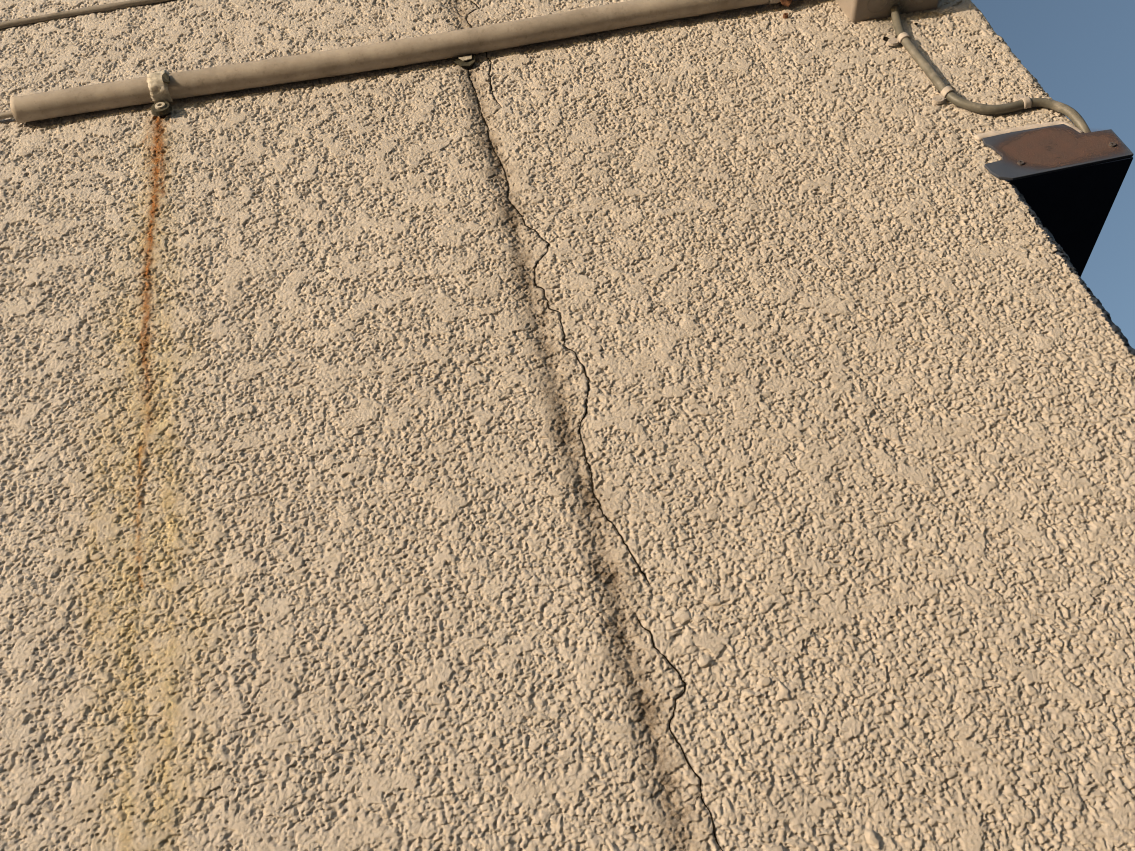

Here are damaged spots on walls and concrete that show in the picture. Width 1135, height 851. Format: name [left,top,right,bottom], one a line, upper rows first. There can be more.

rust [141,118,164,346]
crack [468,52,652,588]
crack [635,613,723,851]